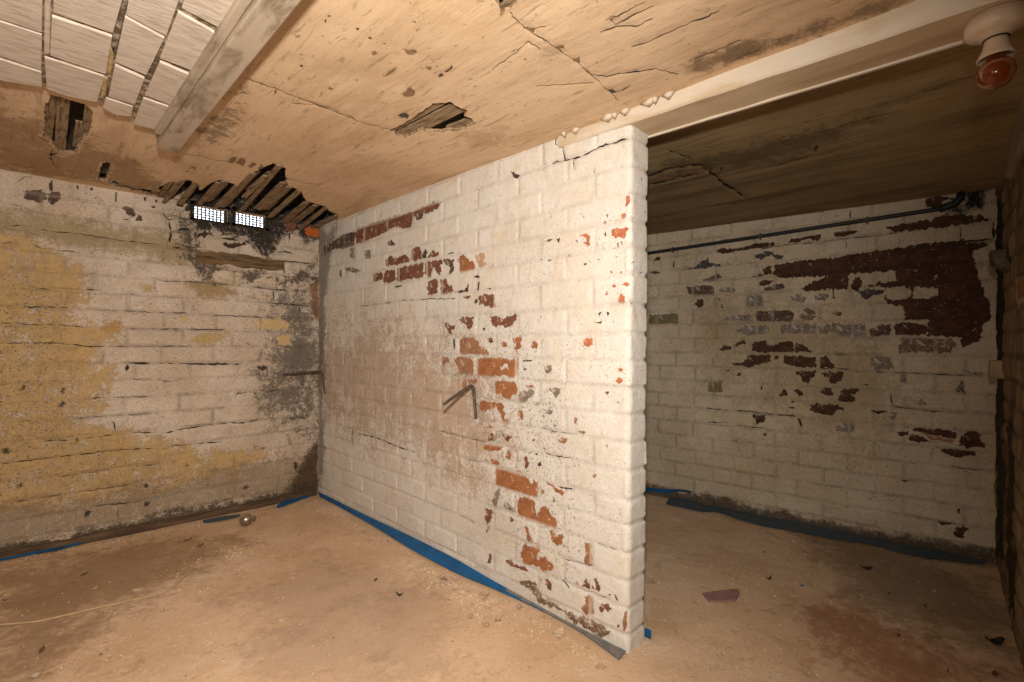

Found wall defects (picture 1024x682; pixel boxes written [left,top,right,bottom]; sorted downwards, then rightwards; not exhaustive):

crack [493,2,759,100]
spalling [389,102,475,138]
peeling [24,180,61,205]
crack [552,138,628,165]
crack [649,150,745,197]
flaking render [648,313,679,325]
flaking render [673,196,992,433]
water stain [0,229,318,552]
spalling [76,157,630,638]
peeling [898,428,986,458]